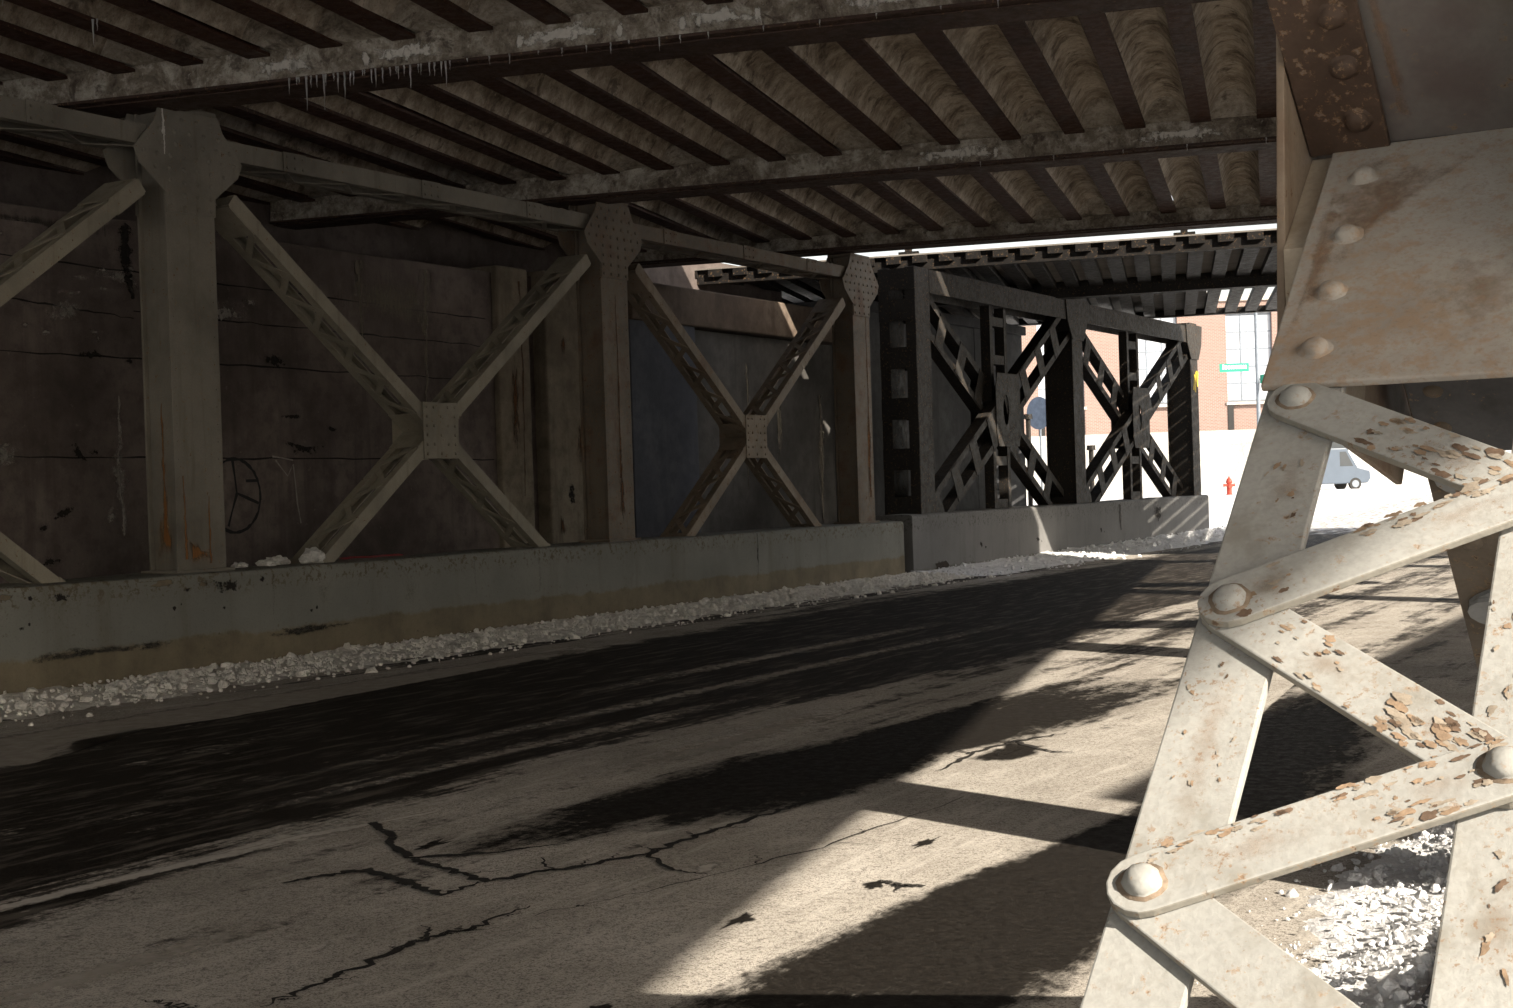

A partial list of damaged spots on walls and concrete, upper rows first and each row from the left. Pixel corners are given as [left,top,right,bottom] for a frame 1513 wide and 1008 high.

damp [23,223,136,334]